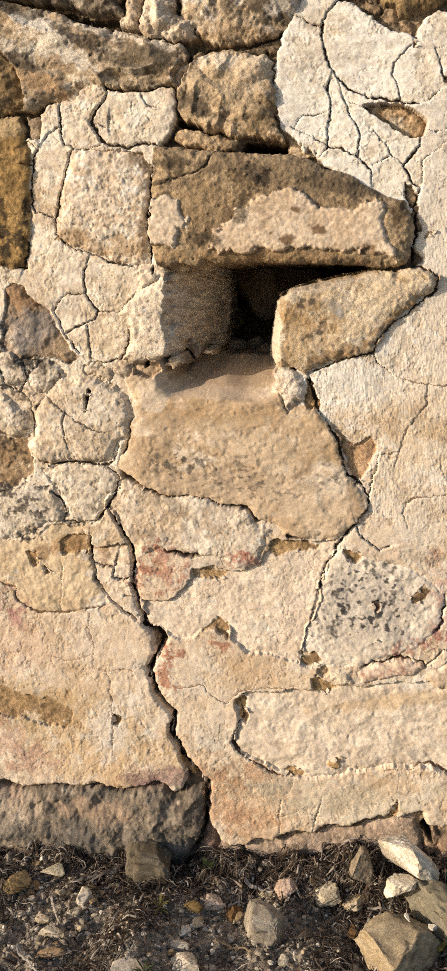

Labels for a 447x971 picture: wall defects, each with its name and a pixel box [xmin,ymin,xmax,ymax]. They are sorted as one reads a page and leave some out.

spalling [362,100,428,138]
crack [175,154,213,179]
crack [23,88,160,363]
crack [294,1,447,647]
spalling [335,430,377,486]
spalling [344,549,363,564]
crack [0,359,293,845]
spalling [409,584,432,605]
crack [363,594,446,666]
spalling [0,686,74,729]
crack [388,761,447,772]